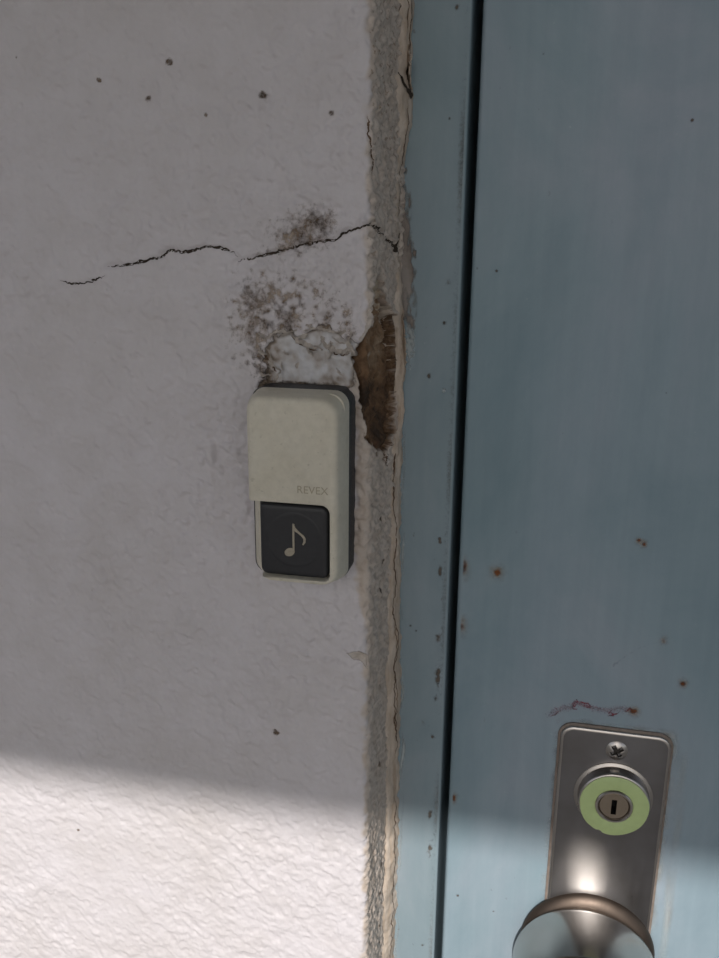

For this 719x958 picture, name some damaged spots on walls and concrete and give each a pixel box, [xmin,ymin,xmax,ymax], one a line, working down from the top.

crack [63,223,400,285]
peeling [257,268,394,466]